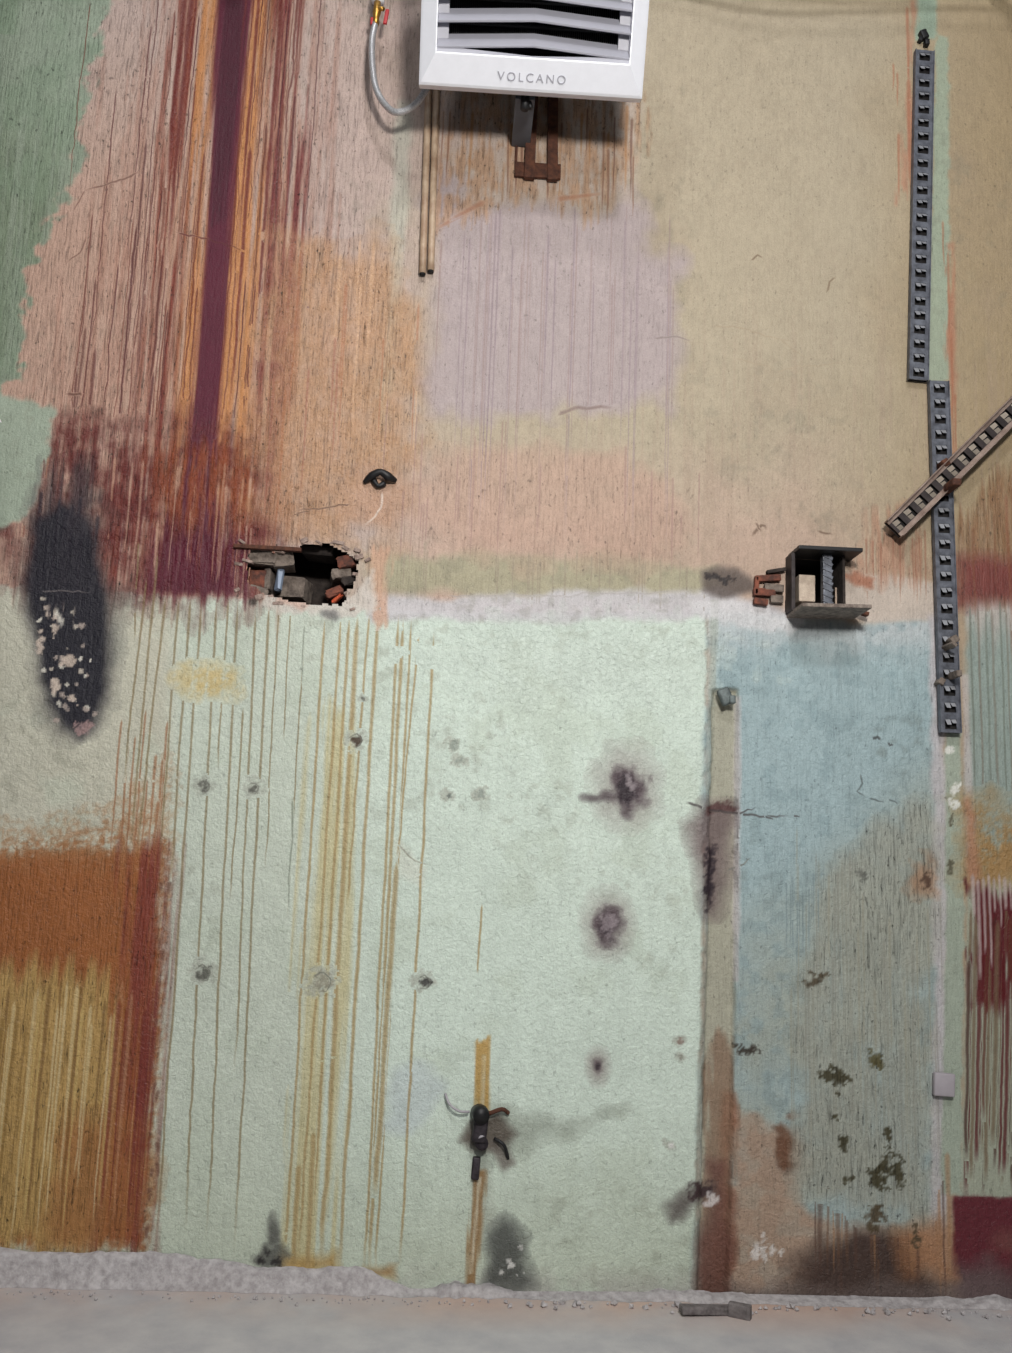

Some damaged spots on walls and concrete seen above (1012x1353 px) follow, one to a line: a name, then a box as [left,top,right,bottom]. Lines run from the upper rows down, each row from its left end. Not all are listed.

corrosion [0,523,27,605]
corrosion [0,709,188,1253]
corrosion [31,0,343,637]
spalling [233,537,381,624]
leakage [123,163,706,1283]
corrosion [690,780,1012,1299]
leakage [783,791,949,1244]